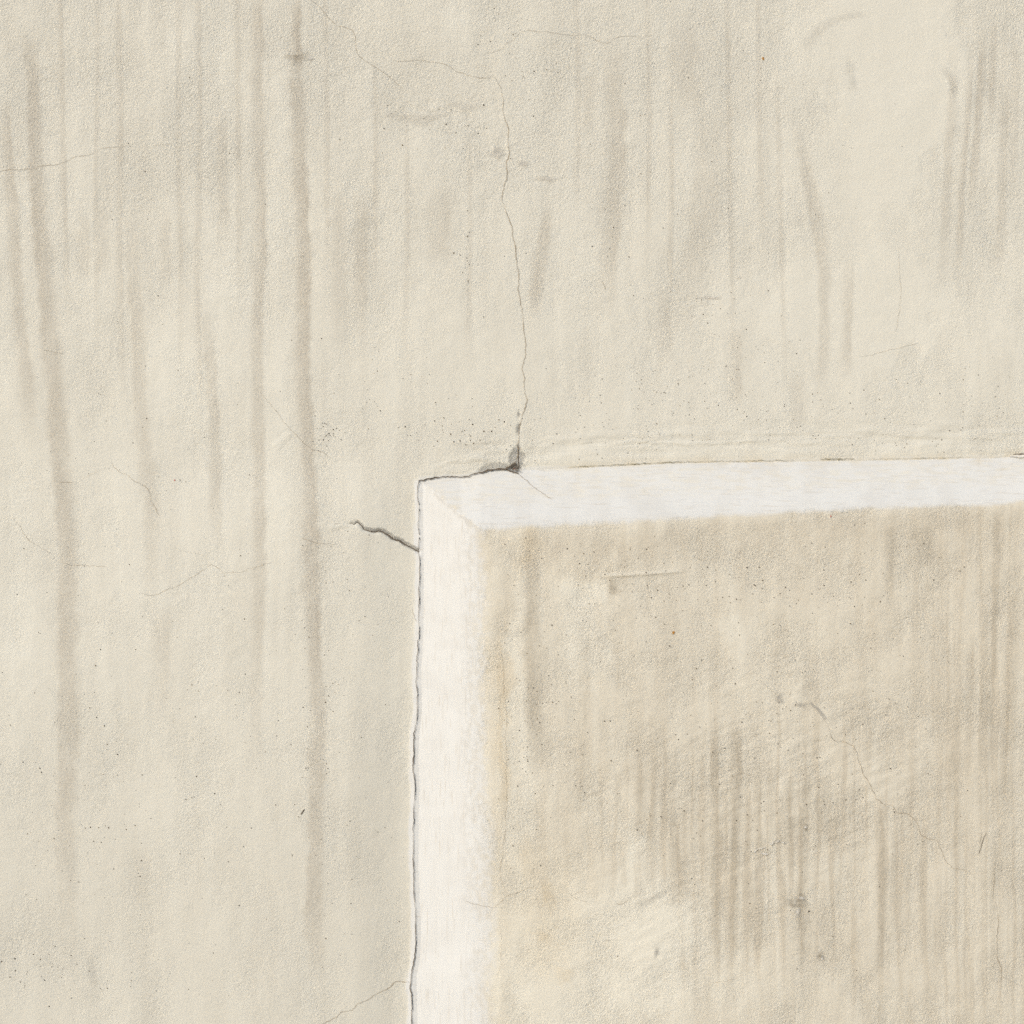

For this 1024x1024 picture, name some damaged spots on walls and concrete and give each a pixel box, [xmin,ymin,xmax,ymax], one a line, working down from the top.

crack [325,63,551,1024]